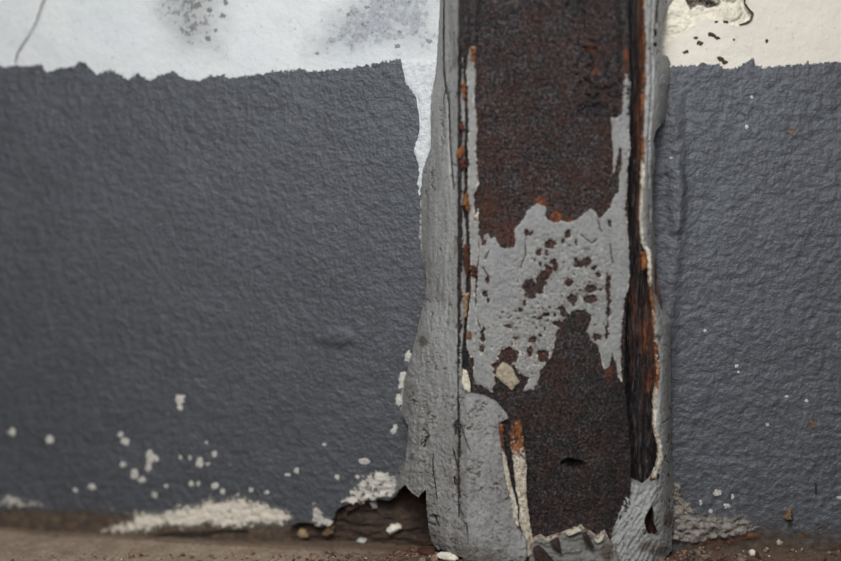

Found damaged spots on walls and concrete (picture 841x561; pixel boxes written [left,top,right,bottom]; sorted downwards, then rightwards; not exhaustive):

crack [14,0,45,63]
water stain [162,0,228,44]
water stain [326,0,435,51]
spalling [661,0,751,49]
peeling [402,60,437,195]
rust [456,145,468,169]
rust [462,242,478,277]
peeling [638,0,663,481]
peeling [496,362,519,390]
peeling [498,419,533,557]
water stain [0,494,295,542]
spalling [288,485,434,546]